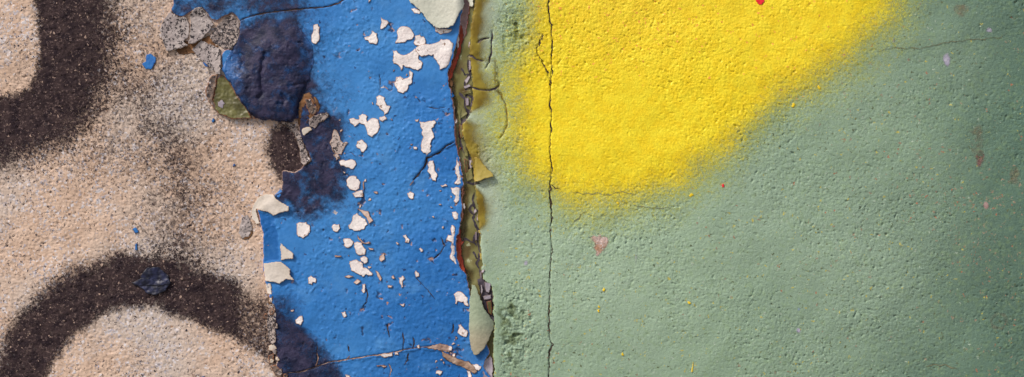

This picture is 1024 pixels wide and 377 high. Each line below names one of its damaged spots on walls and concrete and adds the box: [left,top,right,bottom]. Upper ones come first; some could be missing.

peeling [142,7,256,123]
spalling [311,24,320,44]
spalling [364,0,473,124]
peeling [238,189,289,240]
spalling [278,92,419,293]
spalling [411,119,466,264]
peeling [474,157,494,182]
crack [536,0,672,377]
peeling [263,244,294,377]
peeling [417,253,495,377]